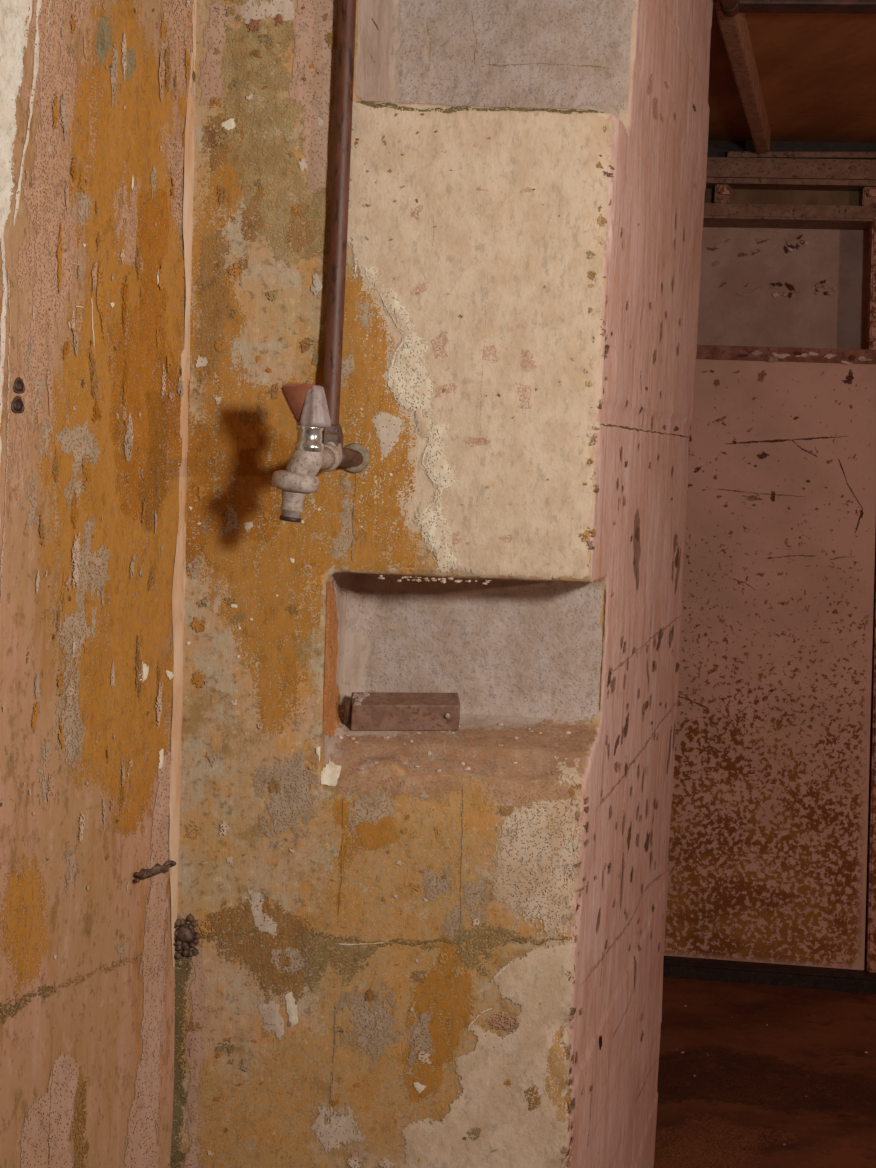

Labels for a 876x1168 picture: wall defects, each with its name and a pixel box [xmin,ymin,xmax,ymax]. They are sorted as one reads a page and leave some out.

peeling [153,0,338,192]
peeling [160,122,185,238]
peeling [0,0,137,815]
peeling [330,0,679,1168]
peeling [138,661,149,681]
corrosion [665,481,865,965]
peeling [252,744,342,853]
crack [336,797,344,925]
peeling [124,749,171,1168]
peeling [245,888,309,977]
peeling [257,992,298,1040]
peeling [311,1099,369,1168]